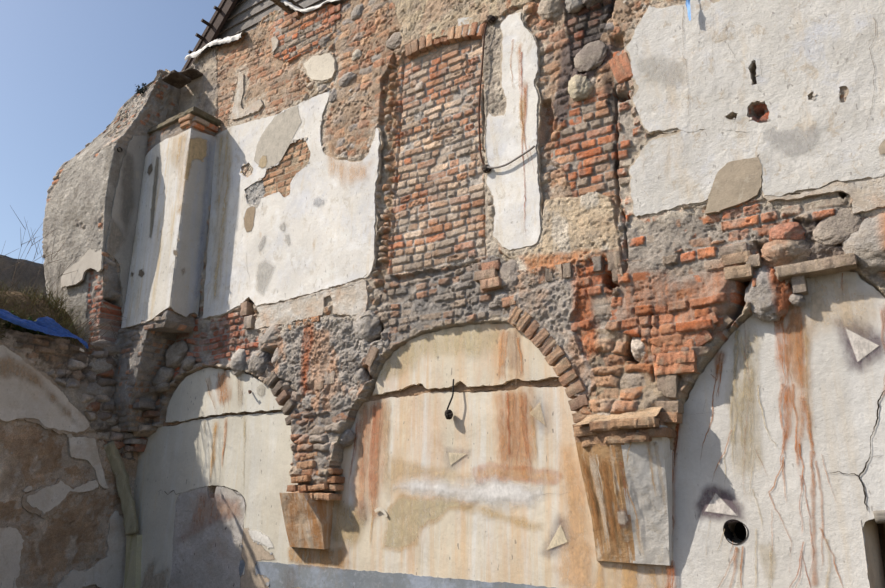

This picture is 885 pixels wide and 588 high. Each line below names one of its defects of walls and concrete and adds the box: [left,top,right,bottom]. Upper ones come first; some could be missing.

spalling [748,100,770,123]
spalling [240,106,311,232]
rust [217,371,227,404]
rust [703,360,722,443]
rust [768,317,829,516]
crack [833,390,885,511]
spalling [22,493,110,588]
peeling [240,528,275,588]